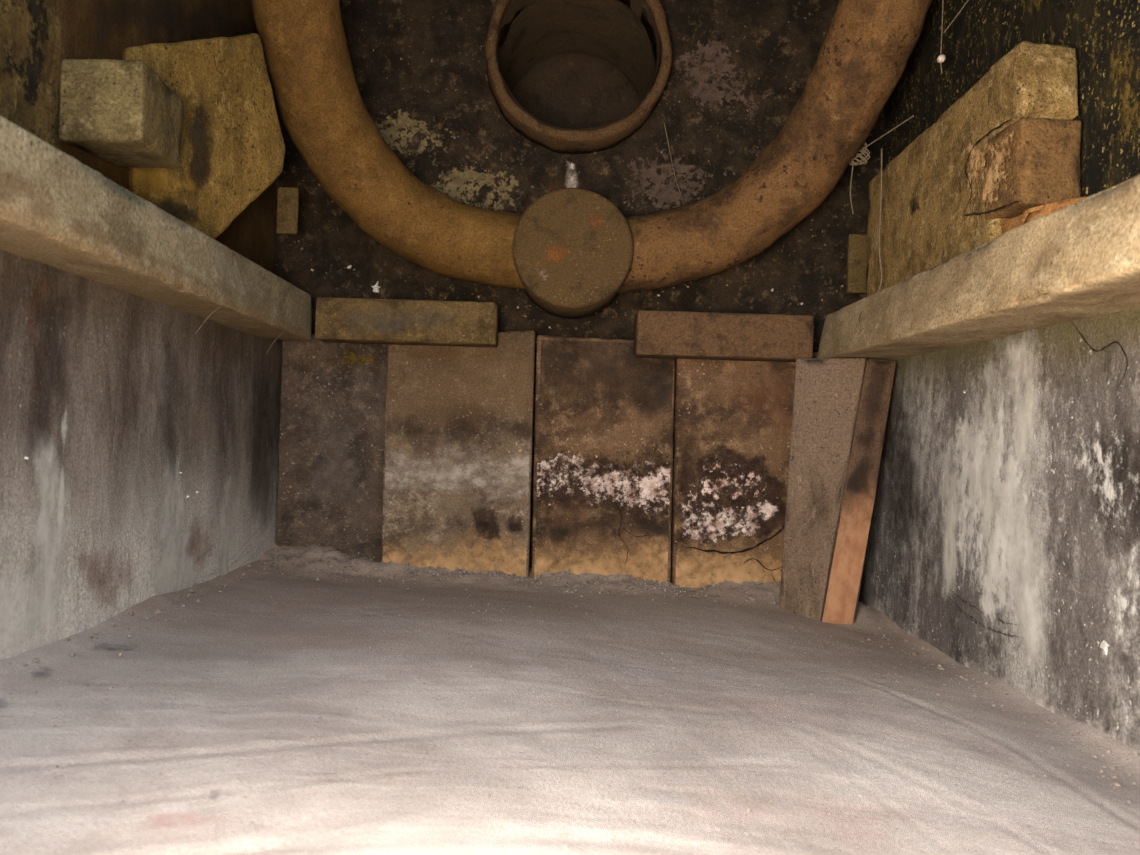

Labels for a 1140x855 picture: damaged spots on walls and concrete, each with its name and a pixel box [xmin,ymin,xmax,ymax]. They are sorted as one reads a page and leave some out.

damp [1107,39,1140,143]
damp [0,413,67,656]
damp [154,456,196,596]
damp [942,342,1044,665]